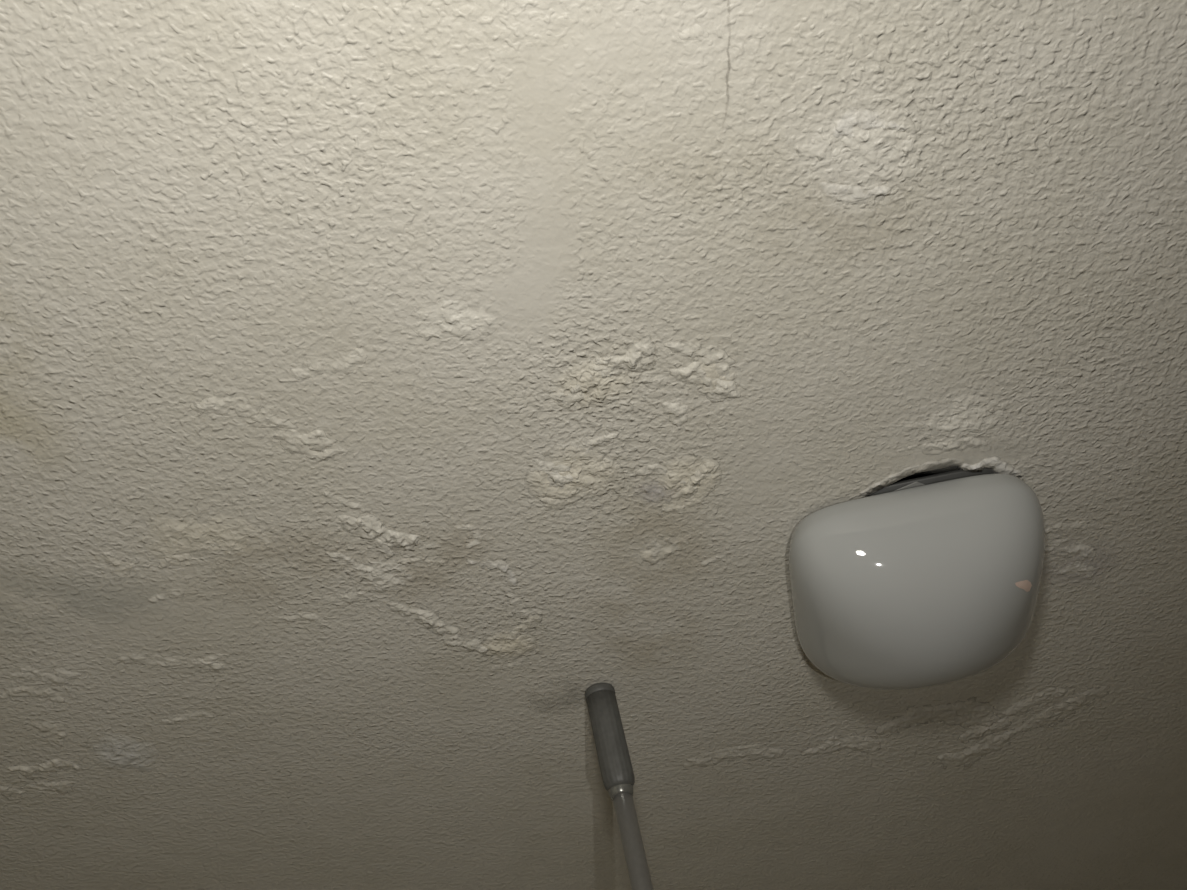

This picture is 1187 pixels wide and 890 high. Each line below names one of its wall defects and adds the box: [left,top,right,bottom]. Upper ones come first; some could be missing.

spalling [859,437,1022,494]